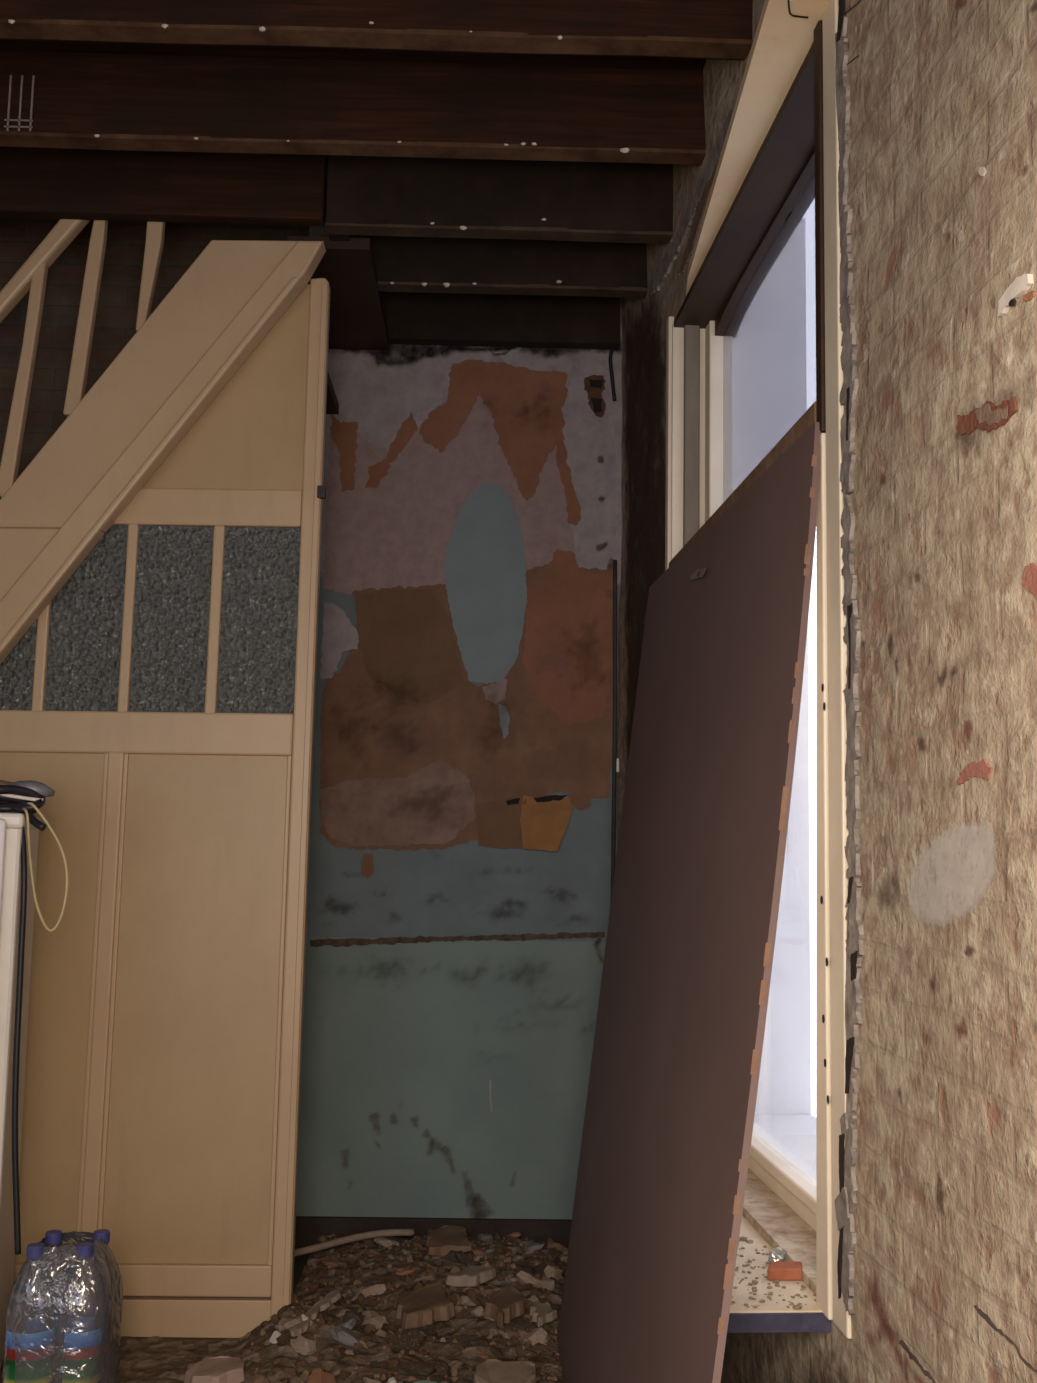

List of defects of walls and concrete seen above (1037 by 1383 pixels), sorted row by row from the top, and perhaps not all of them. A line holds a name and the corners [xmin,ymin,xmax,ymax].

flaking render [330,348,460,449]
flaking render [566,357,621,569]
spalling [956,396,1019,445]
flaking render [319,602,359,679]
peeling [443,482,527,739]